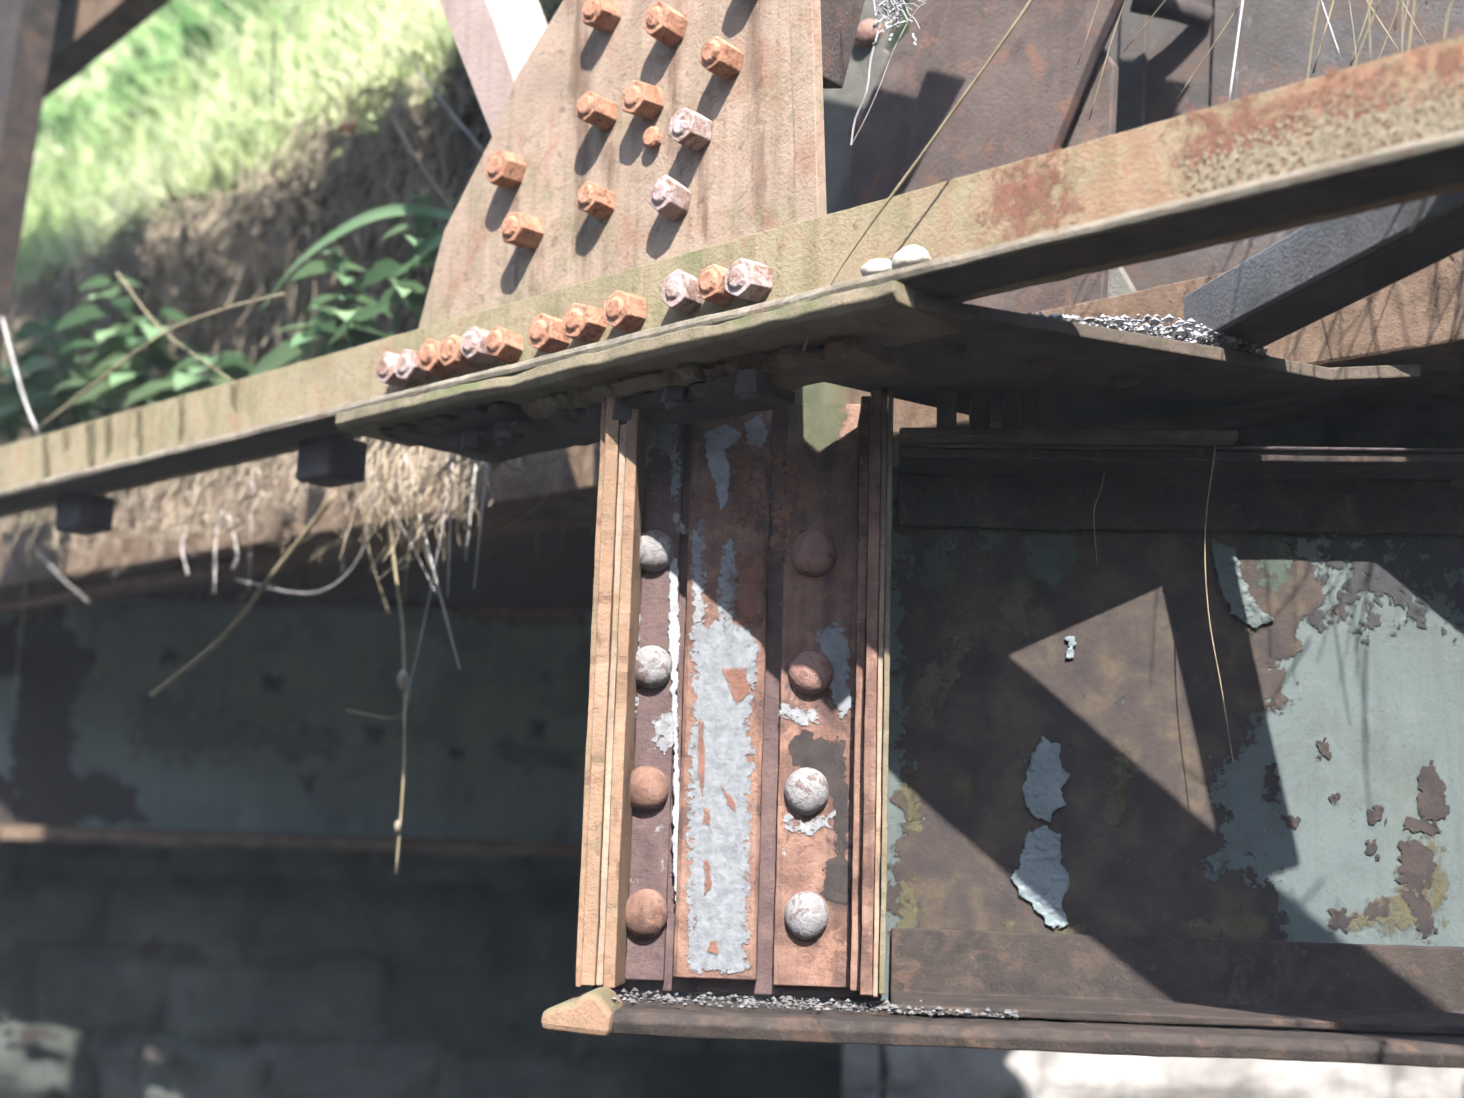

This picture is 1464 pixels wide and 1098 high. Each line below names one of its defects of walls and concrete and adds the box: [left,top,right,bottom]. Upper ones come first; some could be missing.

rust [1168,30,1464,182]
rust [977,144,1083,239]
peeling [704,414,769,510]
peeling [635,423,760,975]
peeling [783,810,836,836]
peeling [779,621,855,726]
rust [788,729,853,905]
peeling [886,498,1464,941]
rust [1262,763,1301,829]
rust [1314,737,1332,759]
rust [1328,759,1452,938]